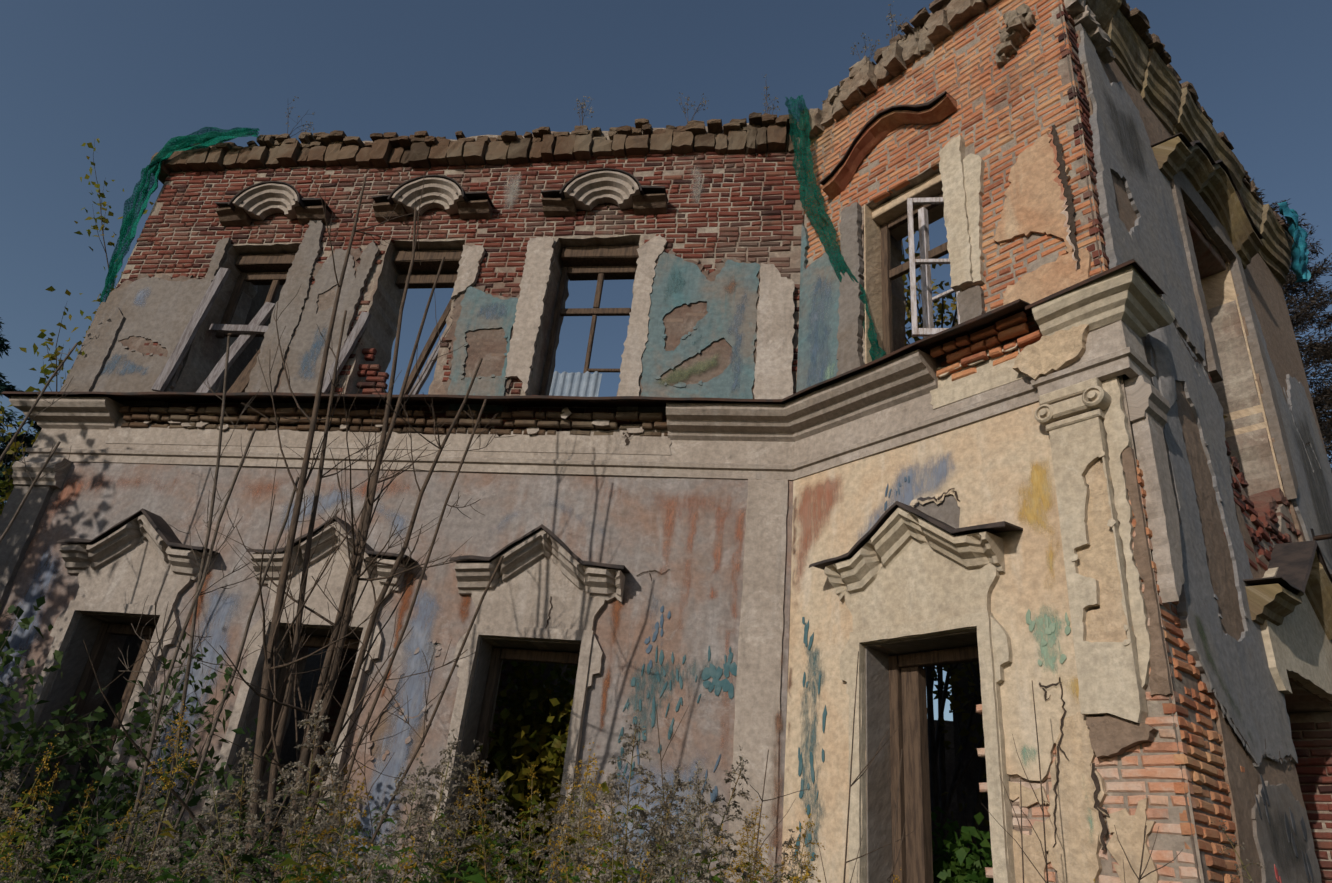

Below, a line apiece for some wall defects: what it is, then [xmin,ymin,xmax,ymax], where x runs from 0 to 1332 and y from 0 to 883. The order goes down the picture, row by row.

peeling [866,457,960,535]
peeling [1019,464,1050,529]
flaking render [1026,447,1173,696]
peeling [608,606,737,882]
peeling [795,617,827,861]
crack [1038,677,1109,851]
flaking render [1085,714,1158,759]